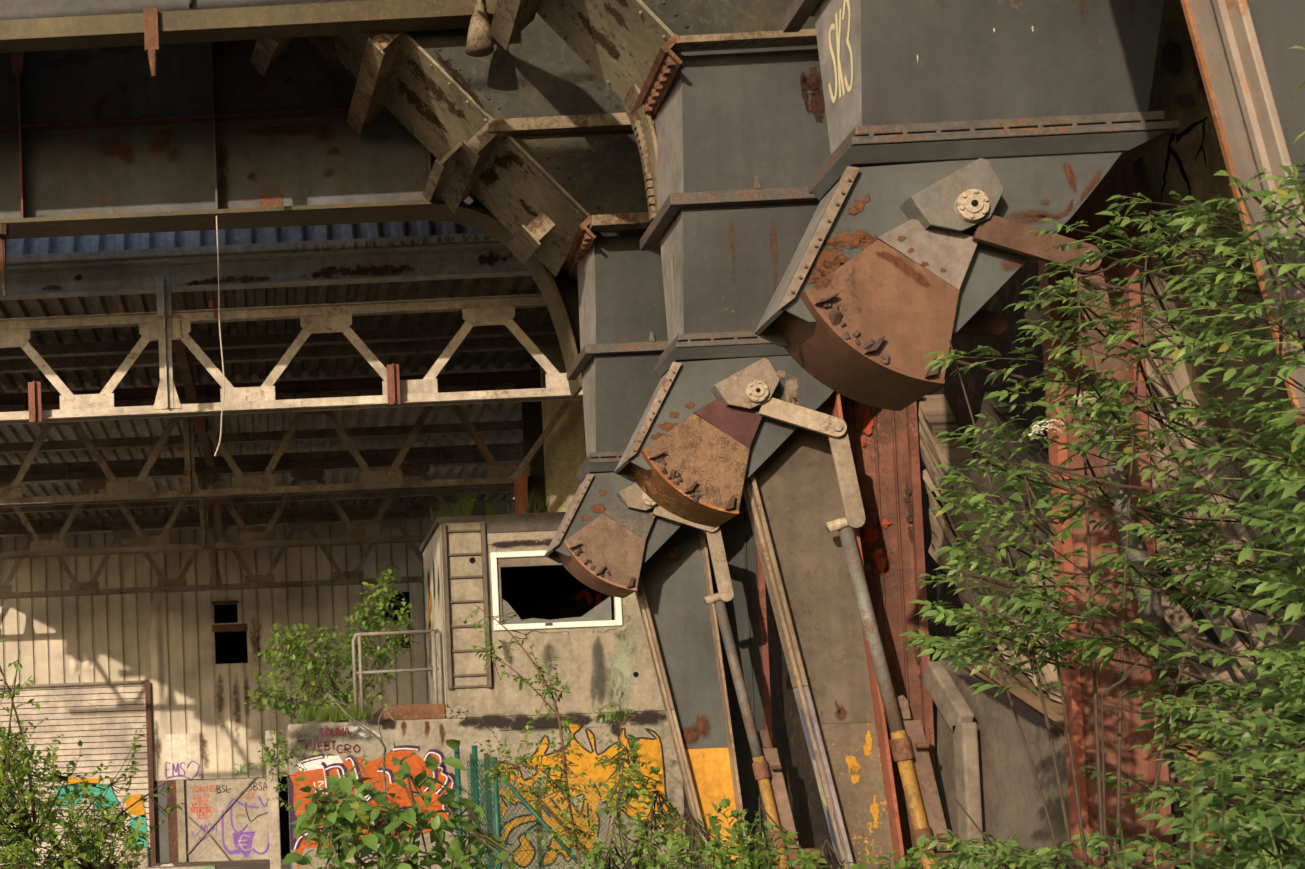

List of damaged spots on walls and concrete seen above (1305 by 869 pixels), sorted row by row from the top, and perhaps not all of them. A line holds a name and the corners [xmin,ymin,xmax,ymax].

peeling [604,0,629,31]
peeling [578,12,620,61]
peeling [396,51,483,135]
peeling [479,151,534,187]
crack [1160,117,1207,203]
rust [184,275,270,286]
rust [300,264,422,279]
rust [804,230,946,288]
rust [651,402,694,440]